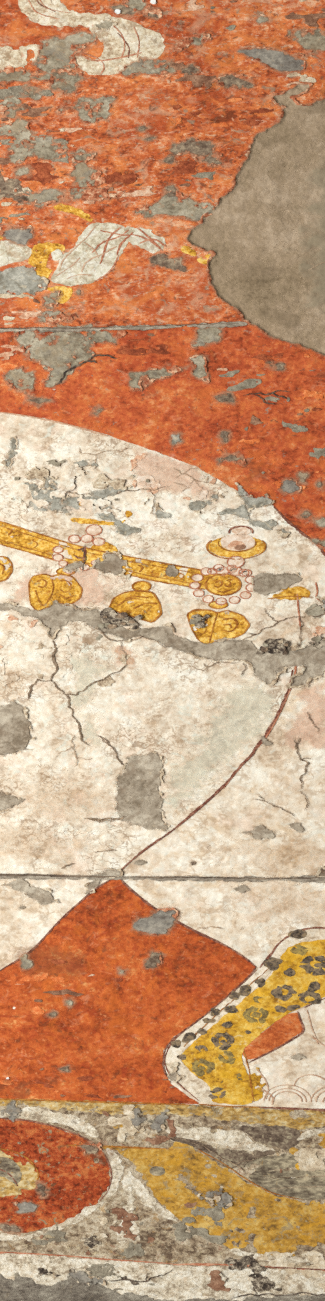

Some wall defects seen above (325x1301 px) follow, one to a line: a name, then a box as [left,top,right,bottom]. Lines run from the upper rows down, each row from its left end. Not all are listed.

flaking render [0,0,325,246]
flaking render [0,265,325,433]
flaking render [183,415,325,538]
flaking render [298,510,325,549]
flaking render [0,645,35,757]
spalling [3,602,143,679]
crack [27,629,165,766]
peeling [97,676,115,687]
flaking render [114,751,169,831]
peeling [220,1148,276,1167]
peeling [294,1147,325,1171]
peeling [172,1188,325,1295]